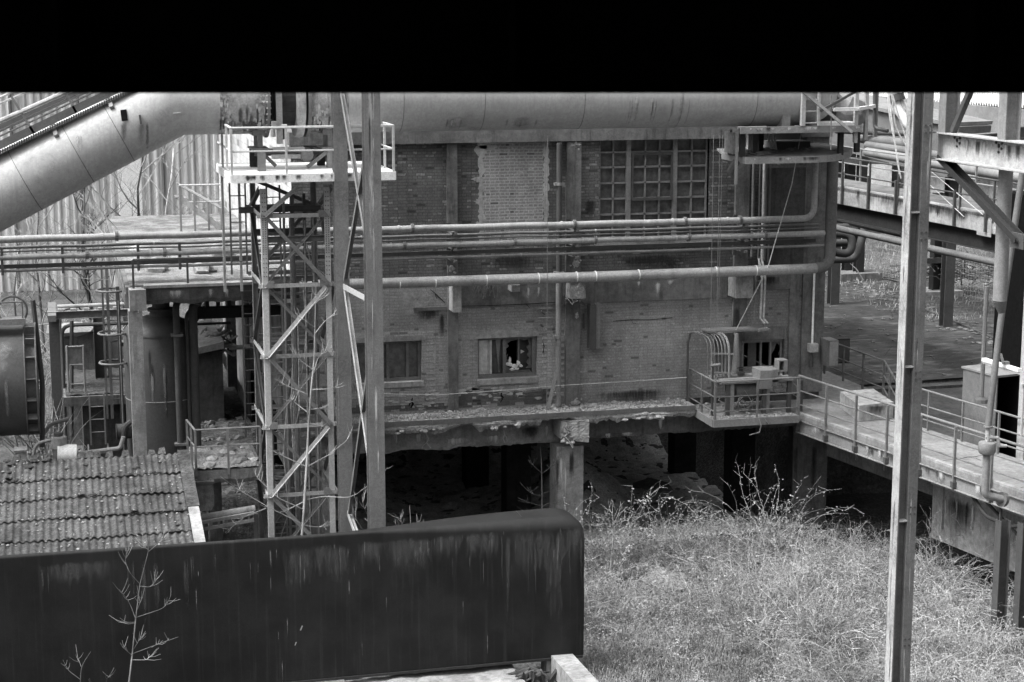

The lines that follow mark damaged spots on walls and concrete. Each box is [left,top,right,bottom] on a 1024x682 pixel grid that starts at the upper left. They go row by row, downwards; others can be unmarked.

spalling [394,425,448,435]
spalling [474,420,521,431]
spalling [560,422,576,448]